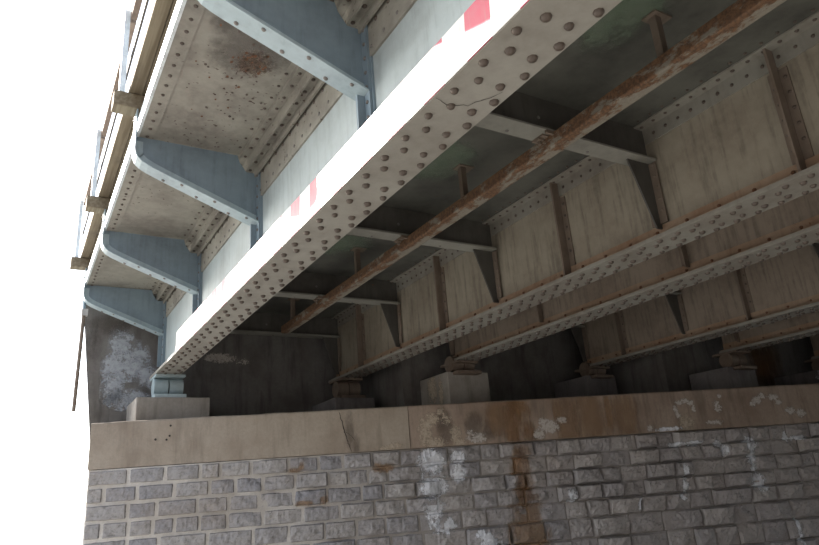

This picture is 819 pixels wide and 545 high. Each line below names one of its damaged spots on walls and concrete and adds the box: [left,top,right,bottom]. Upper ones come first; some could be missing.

water stain [416,448,467,535]
corrosion [489,401,547,545]
water stain [680,465,690,500]
water stain [741,436,768,492]
water stain [476,529,509,545]